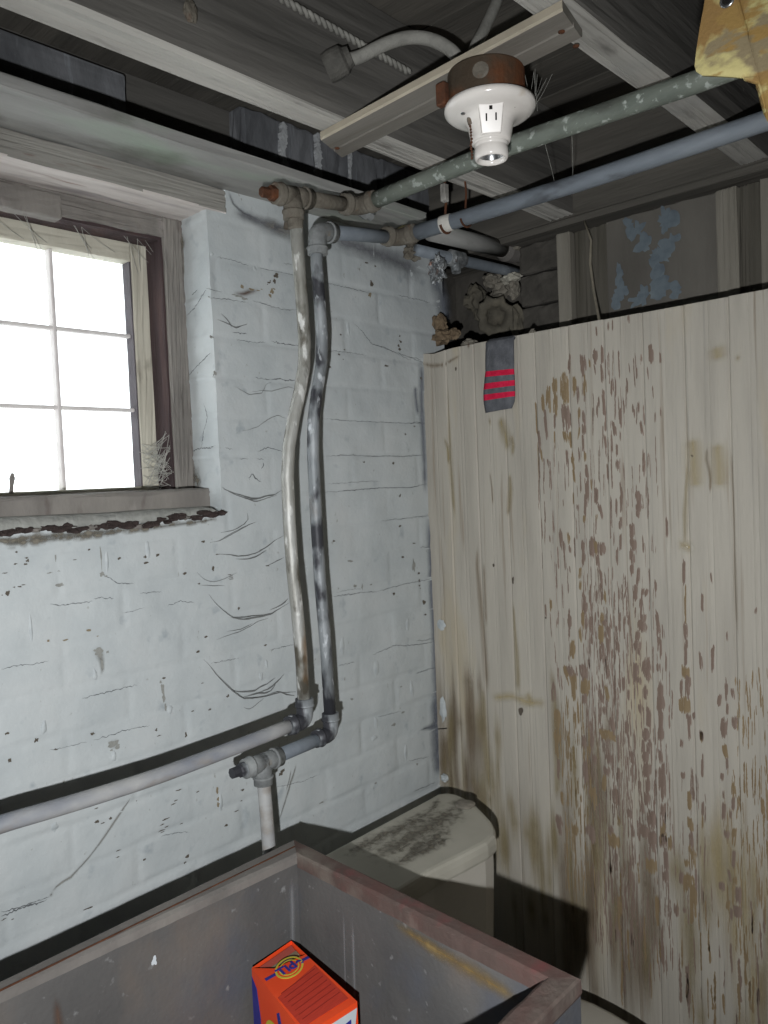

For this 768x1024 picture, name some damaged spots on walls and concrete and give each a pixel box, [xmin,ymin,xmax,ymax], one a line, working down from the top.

spalling [0,510,228,537]
peeling [535,206,768,1024]
crack [3,897,48,916]